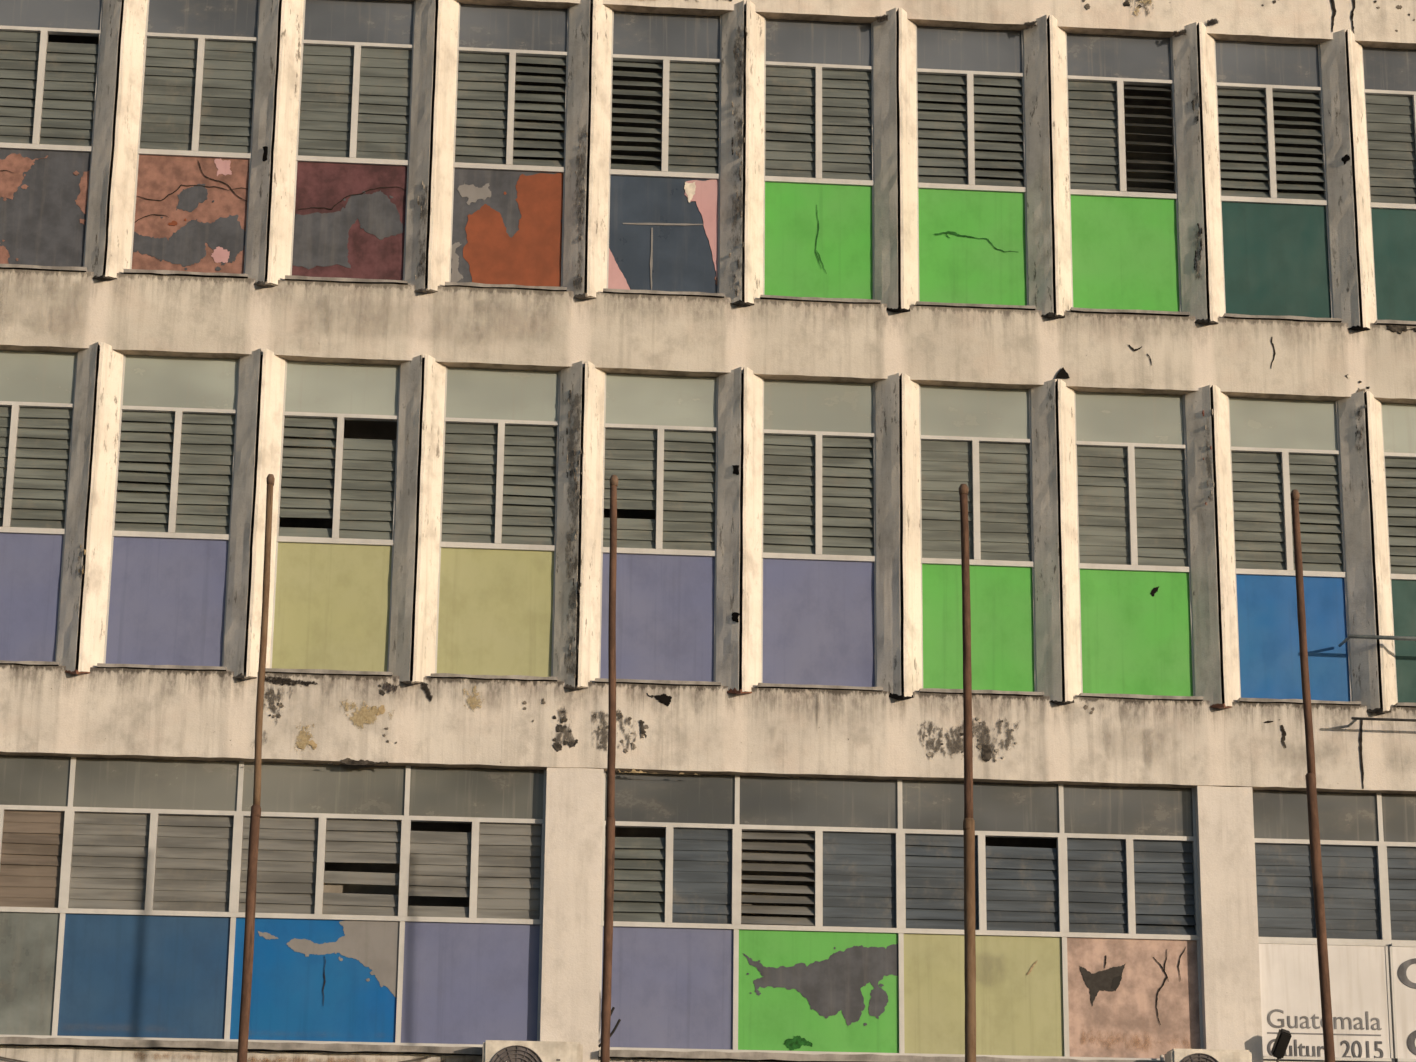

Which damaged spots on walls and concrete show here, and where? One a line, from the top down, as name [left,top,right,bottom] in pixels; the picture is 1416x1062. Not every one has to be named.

peeling [0,240,18,264]
peeling [0,153,48,201]
peeling [73,170,90,225]
peeling [133,158,248,271]
crack [815,205,827,274]
crack [934,231,1017,252]
peeling [258,920,400,1002]
peeling [743,944,898,1026]
peeling [784,1036,813,1051]